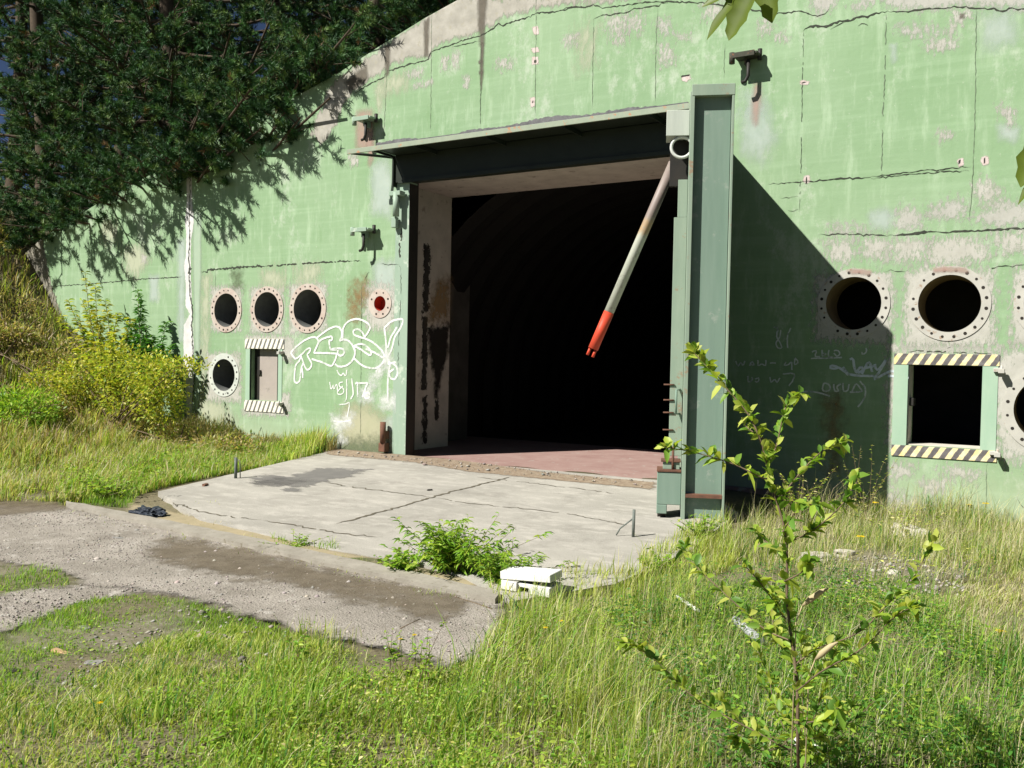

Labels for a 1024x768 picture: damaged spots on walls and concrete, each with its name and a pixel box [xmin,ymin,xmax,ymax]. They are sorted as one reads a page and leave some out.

crack [354,0,724,94]
crack [751,6,1024,31]
crack [775,166,964,211]
crack [819,227,1024,236]
crack [48,177,402,406]
water stain [428,281,450,398]